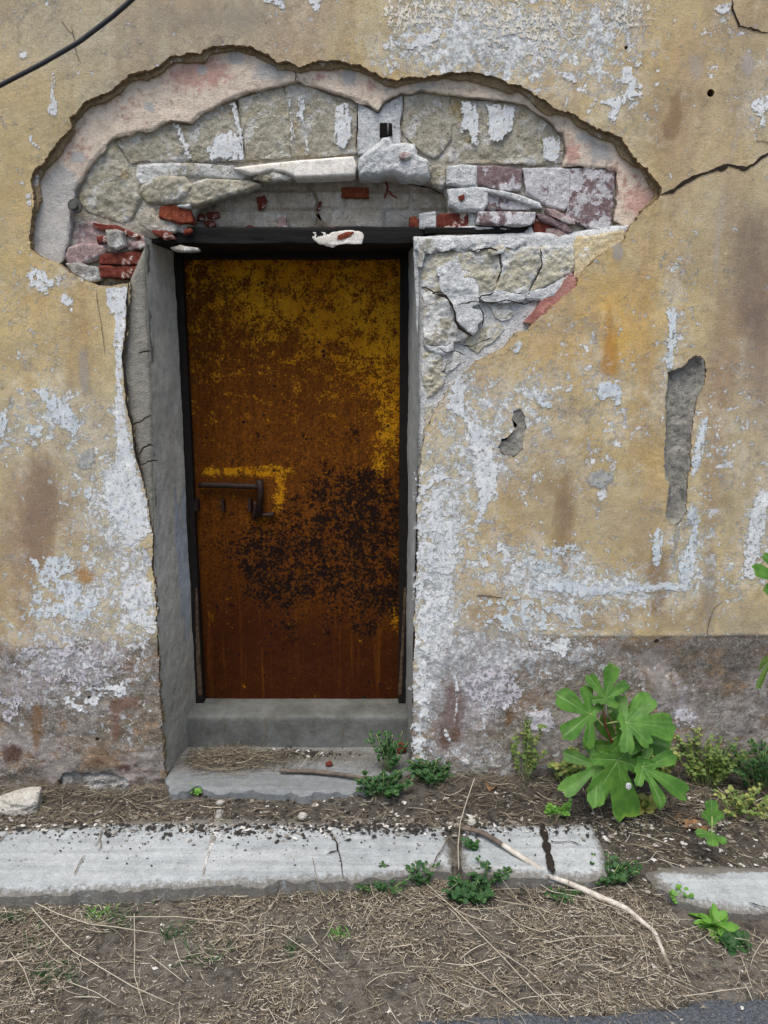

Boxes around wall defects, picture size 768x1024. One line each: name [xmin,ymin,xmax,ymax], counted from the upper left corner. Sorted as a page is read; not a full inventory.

crack [731,0,768,33]
crack [661,140,768,195]
flaking render [23,0,659,762]
spalling [476,306,709,635]
damp [540,635,588,658]
damp [459,661,556,732]
damp [672,705,699,728]